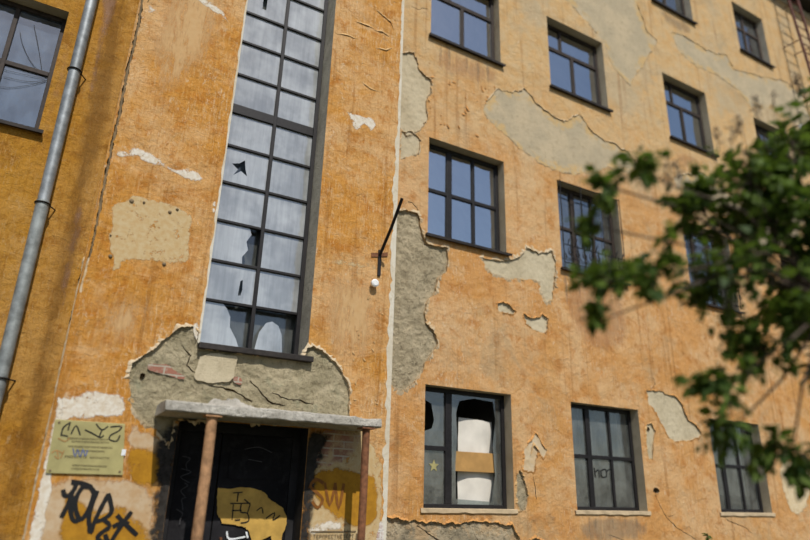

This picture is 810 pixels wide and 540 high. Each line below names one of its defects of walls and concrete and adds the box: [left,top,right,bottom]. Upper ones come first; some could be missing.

crack [82,0,149,278]
peeling [117,148,202,180]
peeling [348,113,376,130]
flaking render [462,86,635,175]
flaking render [671,31,810,129]
peeling [108,196,192,270]
spalling [375,0,548,540]
spalling [479,244,558,334]
spalling [22,257,361,540]
crack [209,381,313,406]
spalling [644,389,702,459]
peeling [780,461,810,515]